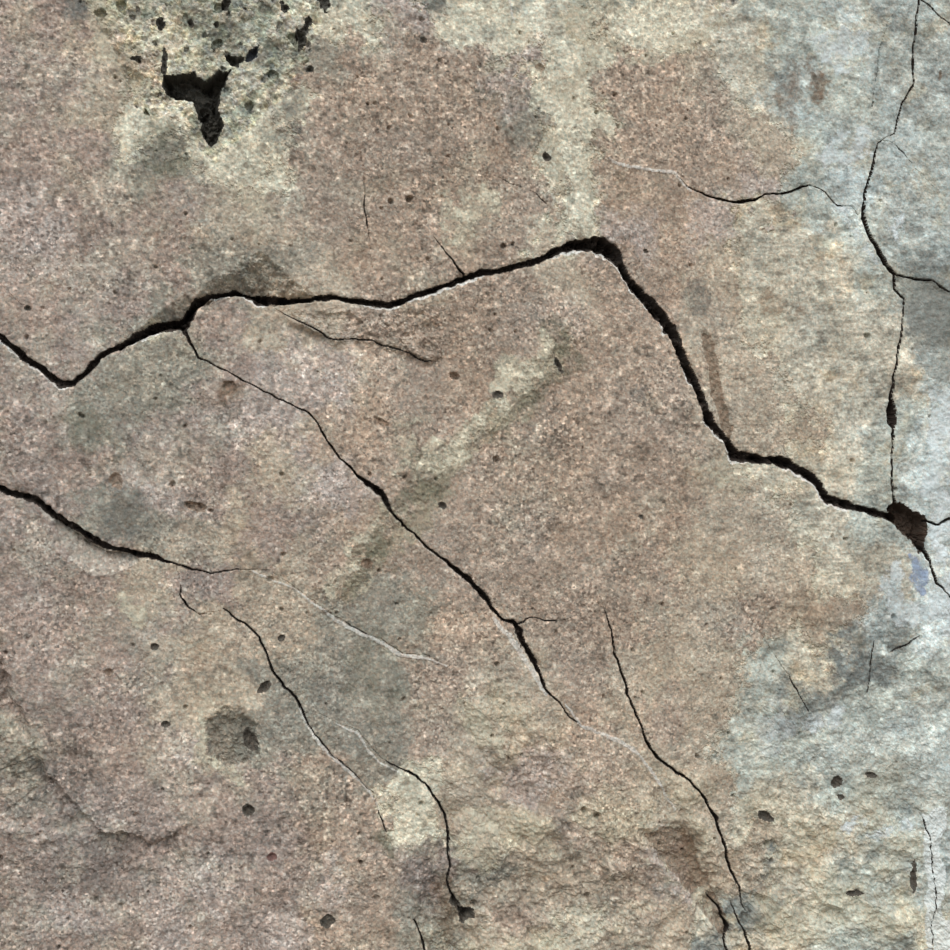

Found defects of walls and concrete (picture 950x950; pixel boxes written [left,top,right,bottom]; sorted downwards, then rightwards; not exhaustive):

spalling [90,0,331,166]
crack [609,157,843,207]
crack [861,0,950,502]
crack [921,517,950,526]
crack [0,236,888,950]
crack [914,545,950,598]
crack [866,636,919,692]